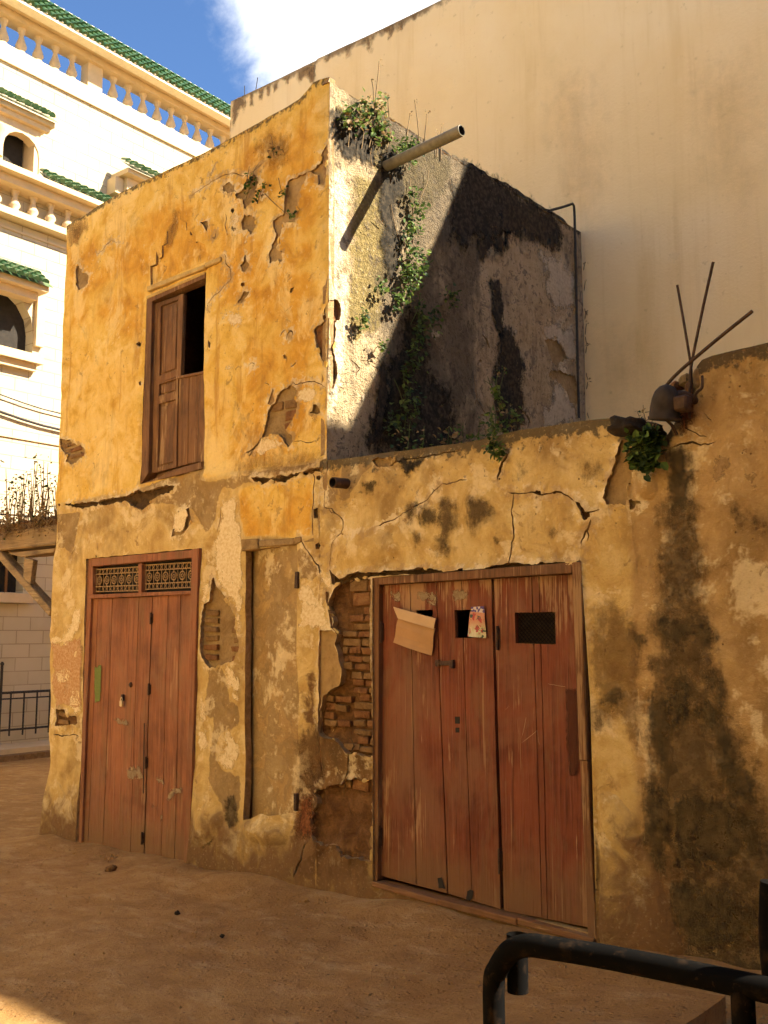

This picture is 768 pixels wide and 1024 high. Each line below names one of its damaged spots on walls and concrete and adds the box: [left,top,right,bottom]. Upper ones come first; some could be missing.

spalling [223,155,328,264]
leakage [448,159,576,361]
leakage [489,278,527,432]
spalling [62,439,85,464]
spalling [64,486,174,510]
peeling [173,509,192,536]
spalling [257,386,320,455]
crack [498,455,598,565]
spalling [606,441,641,510]
spalling [201,498,243,701]
spalling [298,565,443,757]
leakage [593,448,768,971]